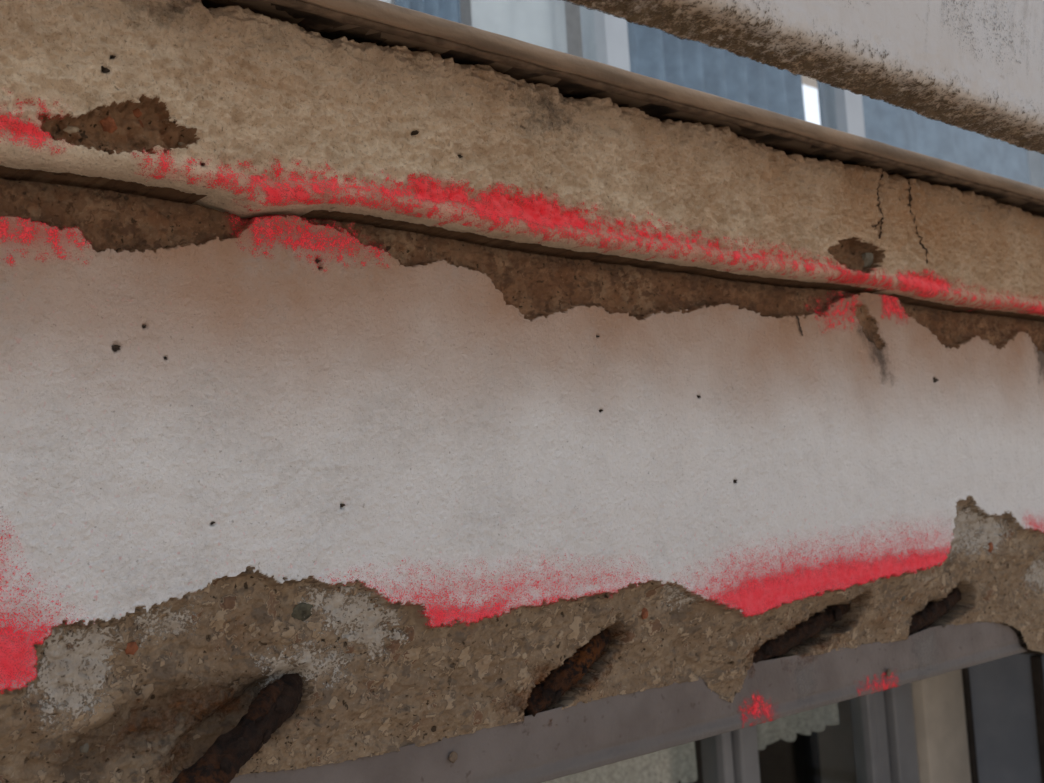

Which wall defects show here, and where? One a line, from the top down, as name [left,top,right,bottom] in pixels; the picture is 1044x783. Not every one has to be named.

flaking render [38,94,200,155]
flaking render [0,165,1044,353]
crack [872,169,884,248]
crack [908,181,931,270]
spalling [0,496,1044,783]